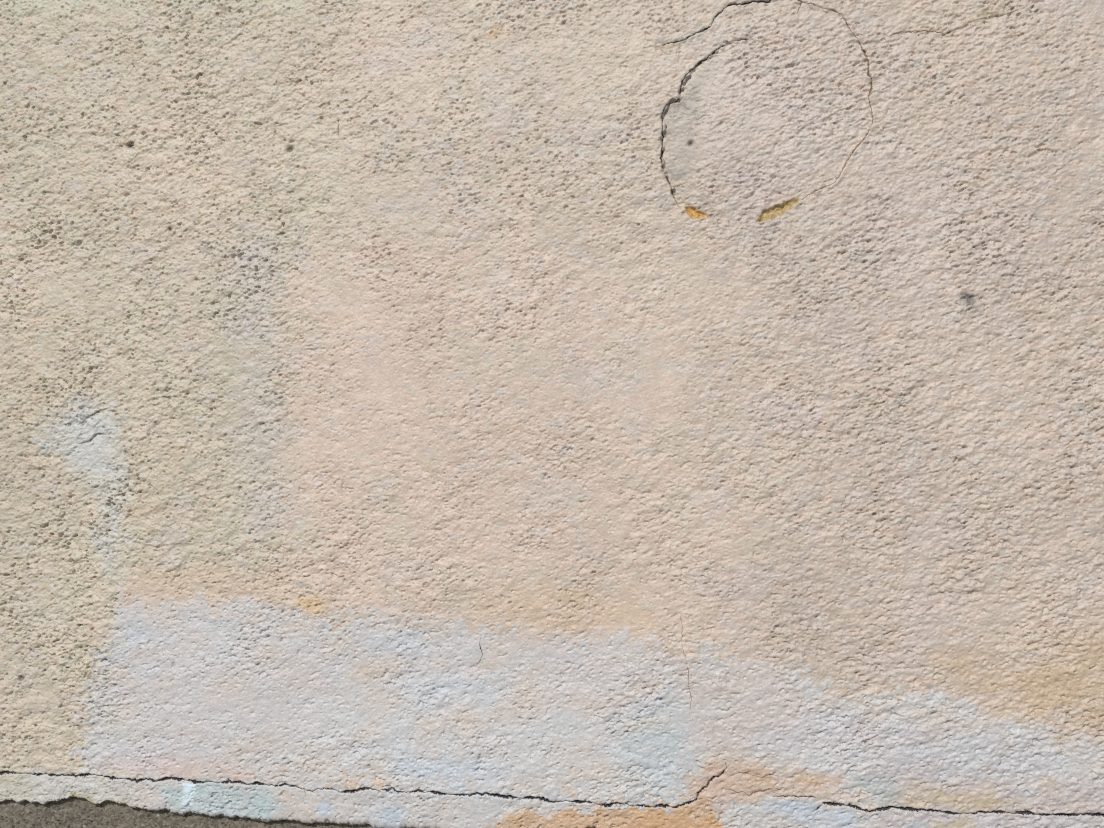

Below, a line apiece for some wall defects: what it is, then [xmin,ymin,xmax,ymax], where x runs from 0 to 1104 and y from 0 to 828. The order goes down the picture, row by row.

crack [890,11,1013,36]
crack [660,0,771,199]
crack [797,0,874,200]
spalling [681,205,711,222]
spalling [753,195,802,226]
leakage [0,384,1104,828]
crack [0,763,1104,817]